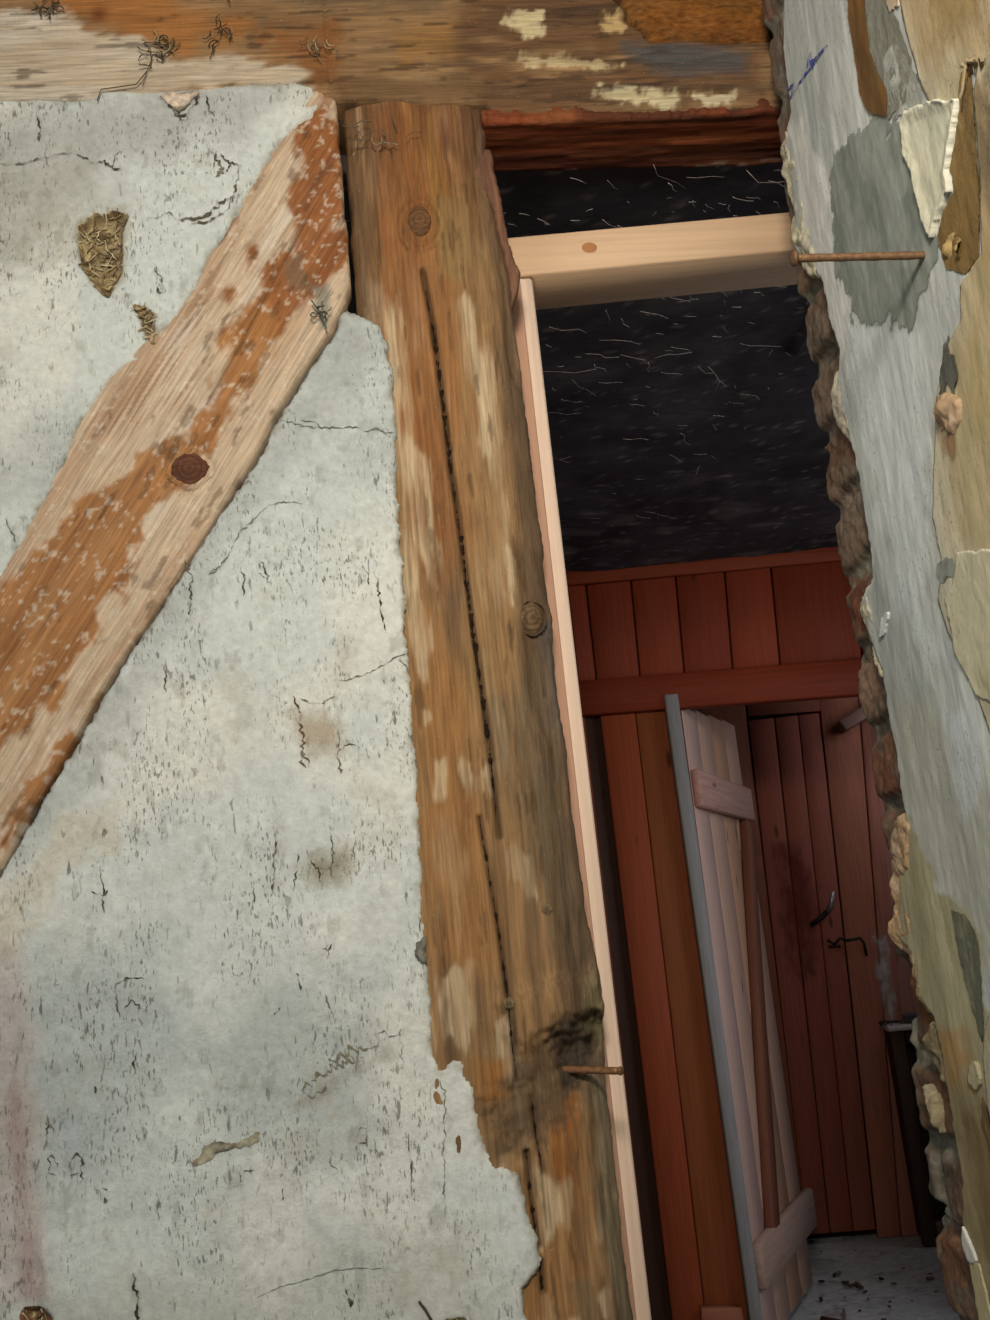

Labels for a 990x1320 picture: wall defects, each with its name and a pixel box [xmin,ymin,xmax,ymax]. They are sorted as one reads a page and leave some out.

spalling [780,131,821,279]
peeling [864,0,980,274]
crack [423,280,543,1290]
spalling [888,813,947,1133]
peeling [951,910,984,1041]